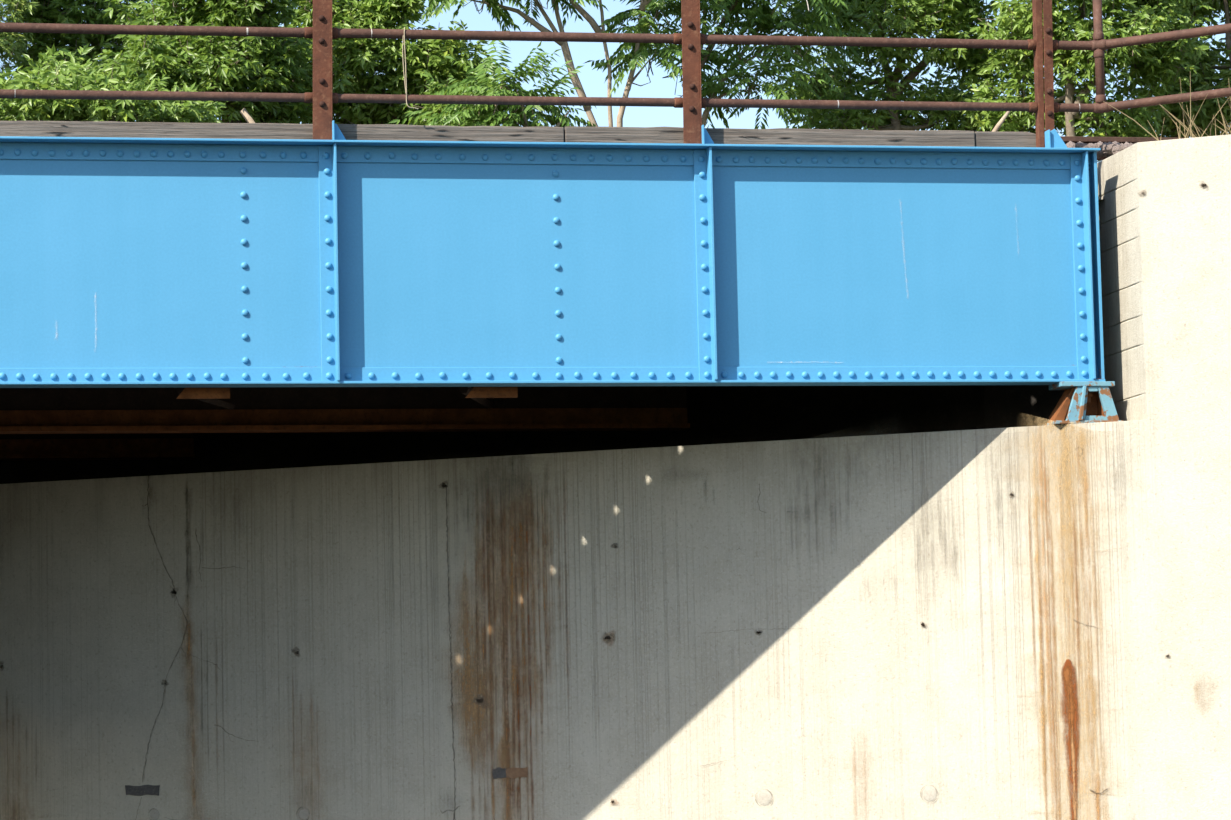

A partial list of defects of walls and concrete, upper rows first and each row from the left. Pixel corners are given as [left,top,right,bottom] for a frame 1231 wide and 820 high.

corrosion [1034,420,1088,564]
corrosion [455,494,547,818]
corrosion [1039,629,1099,820]